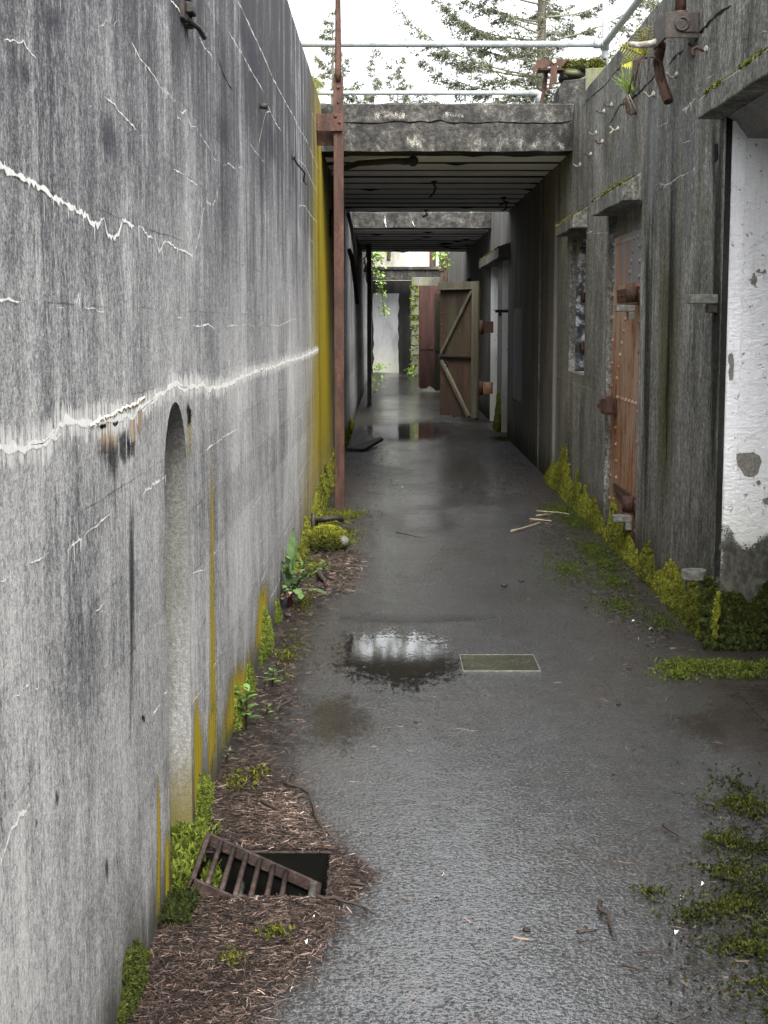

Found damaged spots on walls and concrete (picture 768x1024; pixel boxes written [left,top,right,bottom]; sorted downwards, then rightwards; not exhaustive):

crack [0,161,218,258]
crack [0,346,319,473]
peeling [736,452,768,505]
peeling [715,523,768,603]
damp [208,705,216,769]